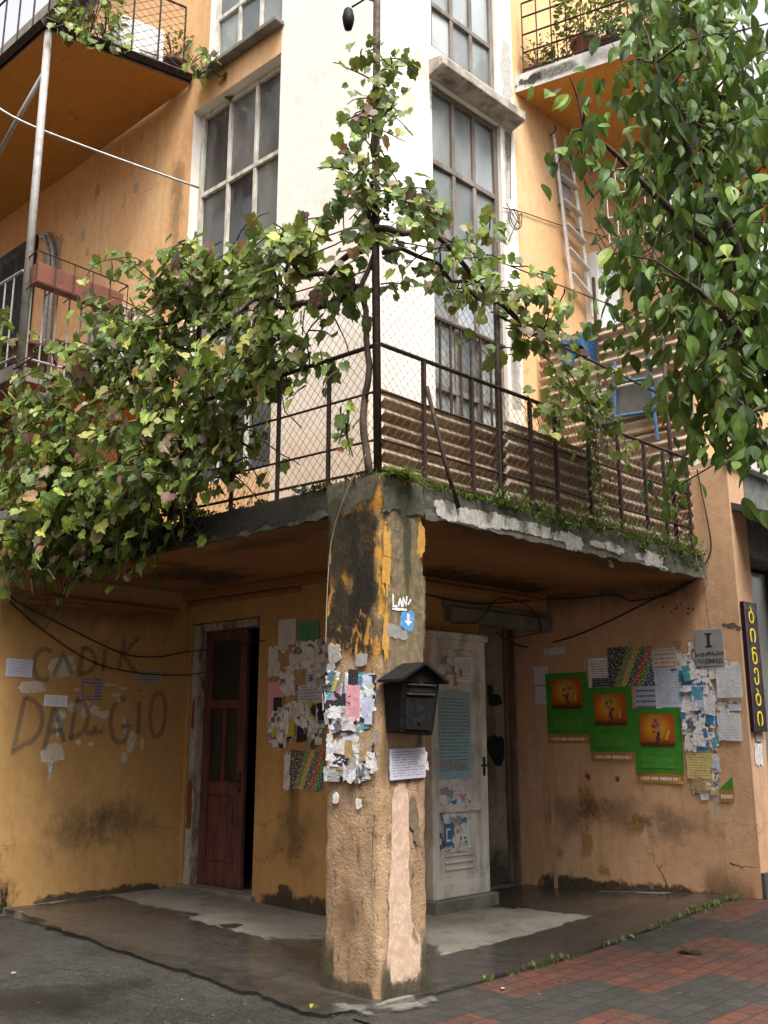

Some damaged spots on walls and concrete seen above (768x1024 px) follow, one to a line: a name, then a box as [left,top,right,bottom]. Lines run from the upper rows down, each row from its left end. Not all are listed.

peeling [267,474,668,784]
water stain [0,851,731,1014]